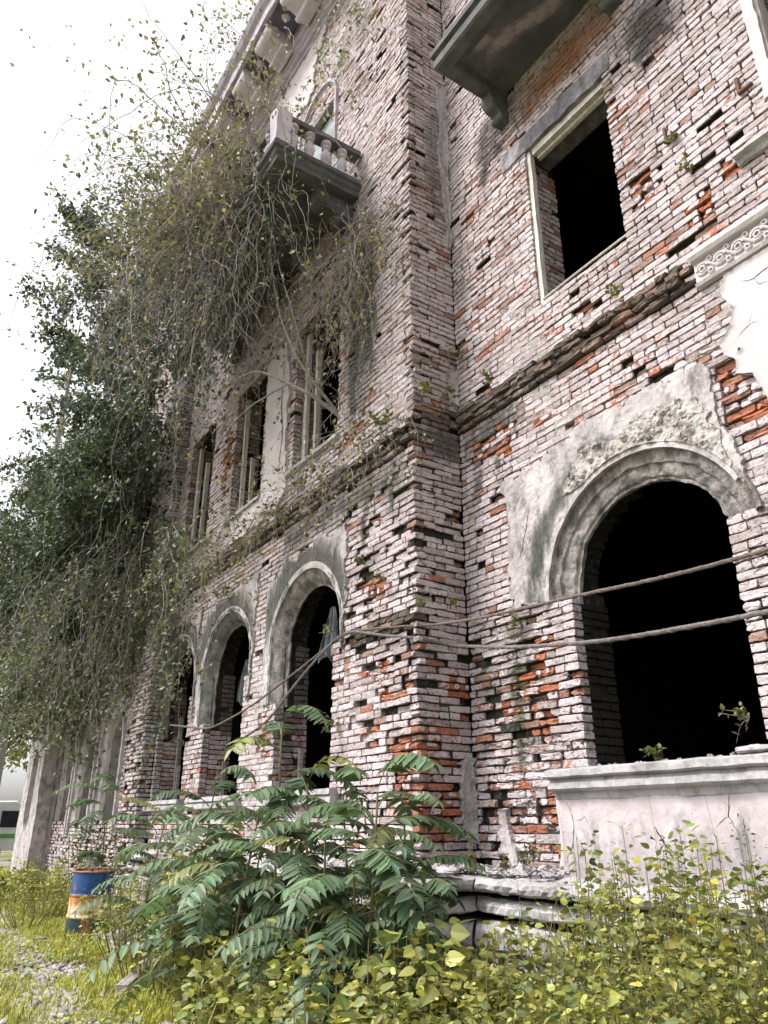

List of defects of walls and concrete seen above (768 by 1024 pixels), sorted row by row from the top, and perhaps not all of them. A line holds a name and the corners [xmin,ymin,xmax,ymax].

spalling [562,246,768,496]
leakage [163,458,399,670]
leakage [527,469,572,604]